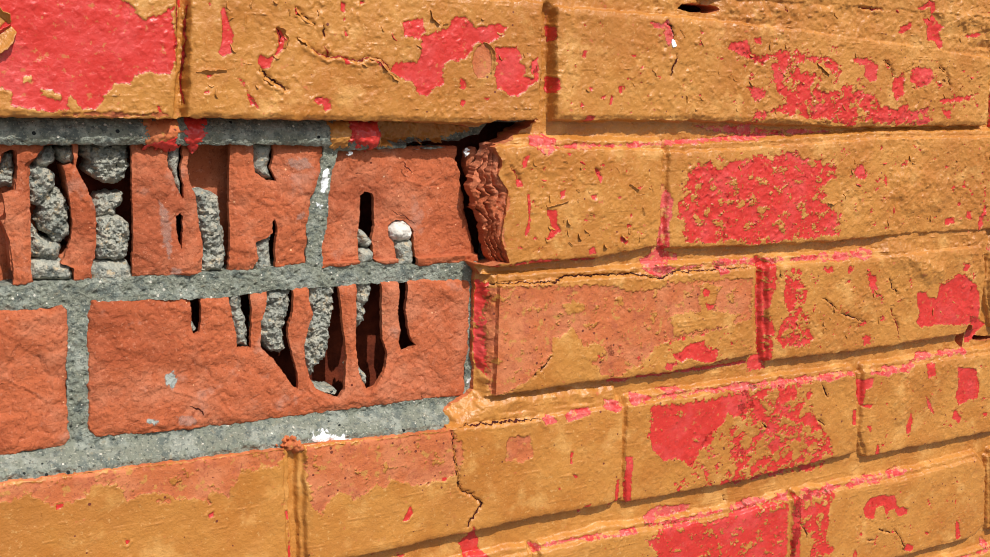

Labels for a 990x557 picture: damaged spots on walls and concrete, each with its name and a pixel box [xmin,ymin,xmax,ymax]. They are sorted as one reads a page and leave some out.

crack [261,71,286,90]
crack [277,7,399,82]
peeling [522,37,990,187]
peeling [850,153,916,194]
spalling [0,0,847,515]
crack [491,266,749,285]
peeling [603,262,986,492]
crack [451,418,538,527]
peeling [527,466,913,557]